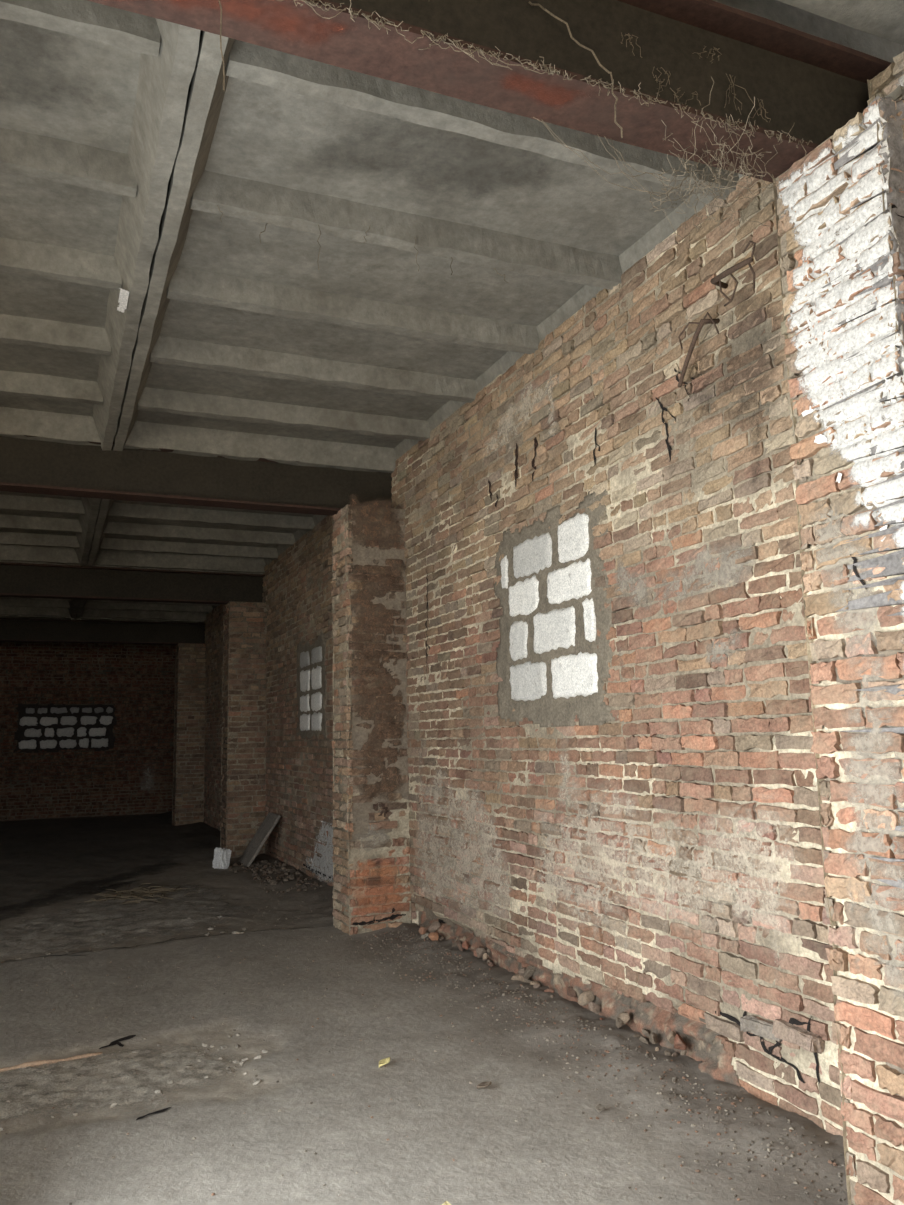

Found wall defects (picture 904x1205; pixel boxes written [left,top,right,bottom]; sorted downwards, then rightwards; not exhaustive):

crack [592,428,600,466]
peeling [779,75,904,617]
spalling [348,498,409,823]
crack [715,1011,820,1086]